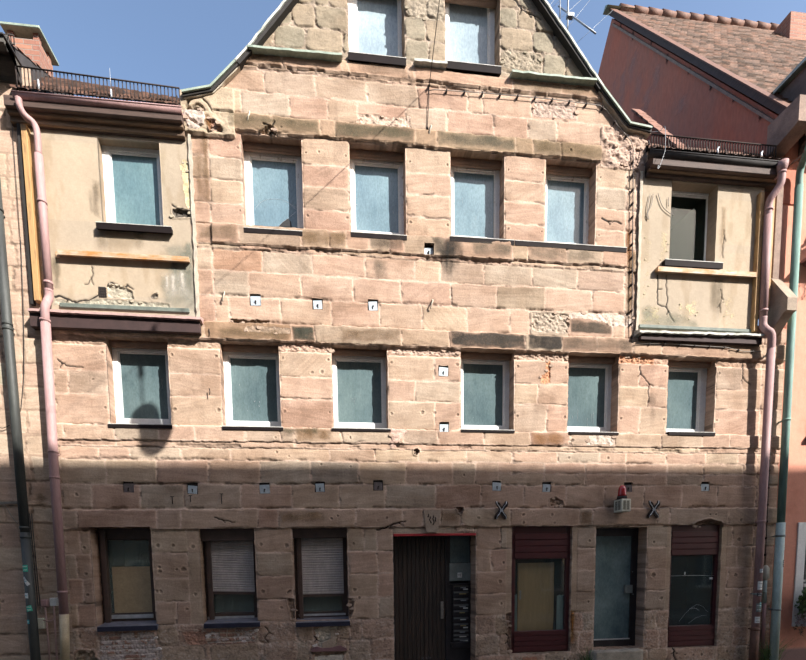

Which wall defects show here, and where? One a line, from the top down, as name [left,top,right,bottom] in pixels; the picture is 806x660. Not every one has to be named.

spalling [183,108,222,132]
spalling [607,144,642,169]
flaking render [54,283,170,308]
crack [657,275,673,321]
spalling [531,307,659,333]